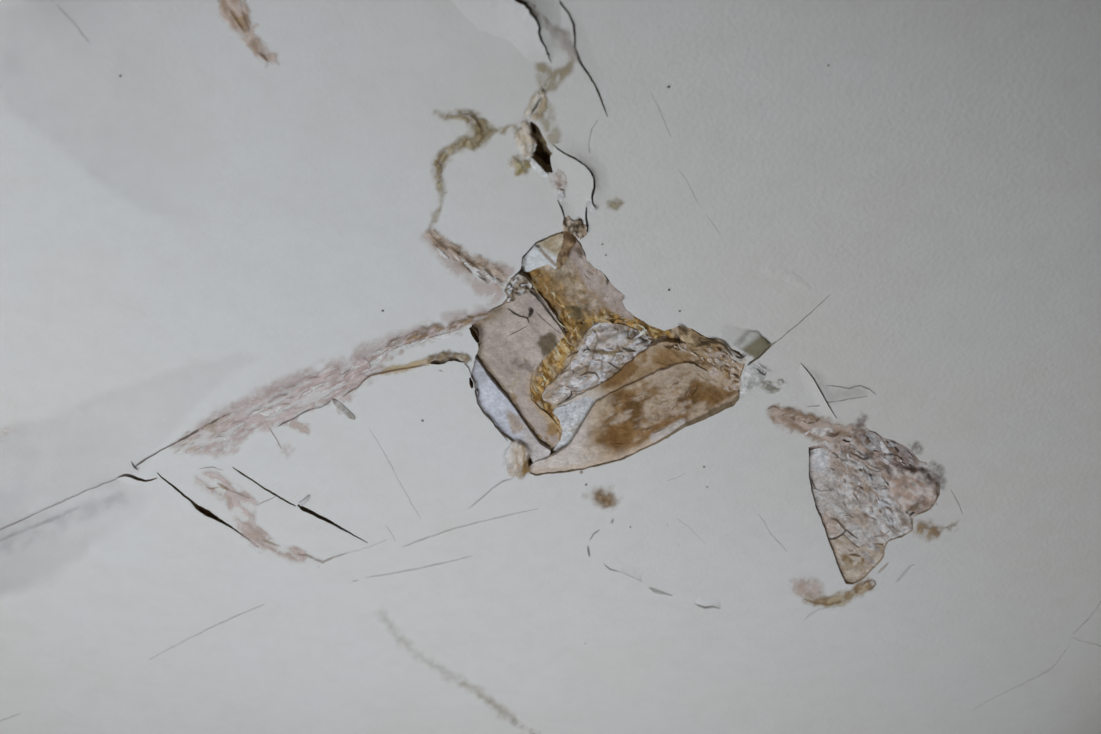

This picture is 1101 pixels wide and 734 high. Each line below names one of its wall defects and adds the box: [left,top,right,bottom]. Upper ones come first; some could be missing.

peeling [219,0,276,63]
crack [451,0,617,116]
water stain [434,111,516,194]
spalling [135,231,770,478]
crack [3,499,68,528]
crack [93,462,258,552]
crack [292,495,366,550]
spalling [769,406,940,582]